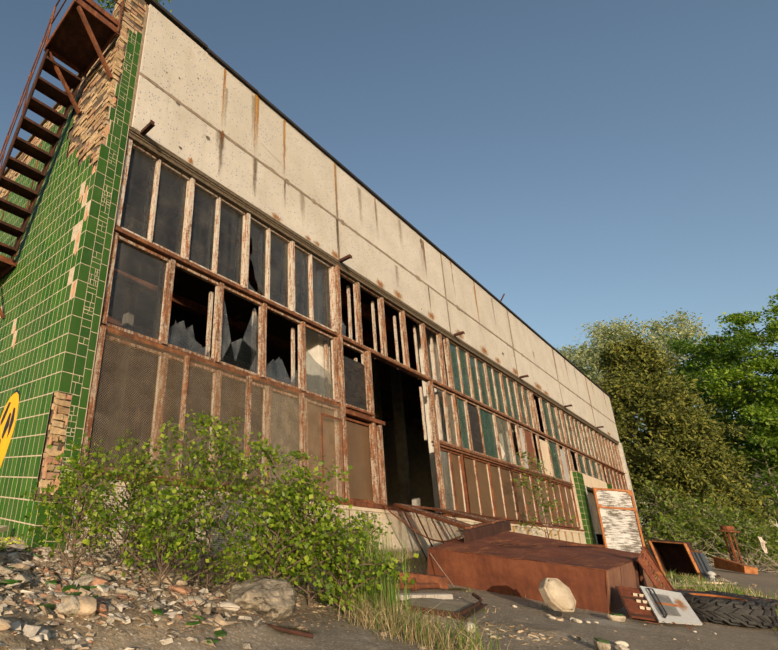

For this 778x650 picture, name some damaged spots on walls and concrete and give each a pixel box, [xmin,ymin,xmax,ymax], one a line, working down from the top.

spalling [55,0,146,174]
spalling [39,391,73,495]